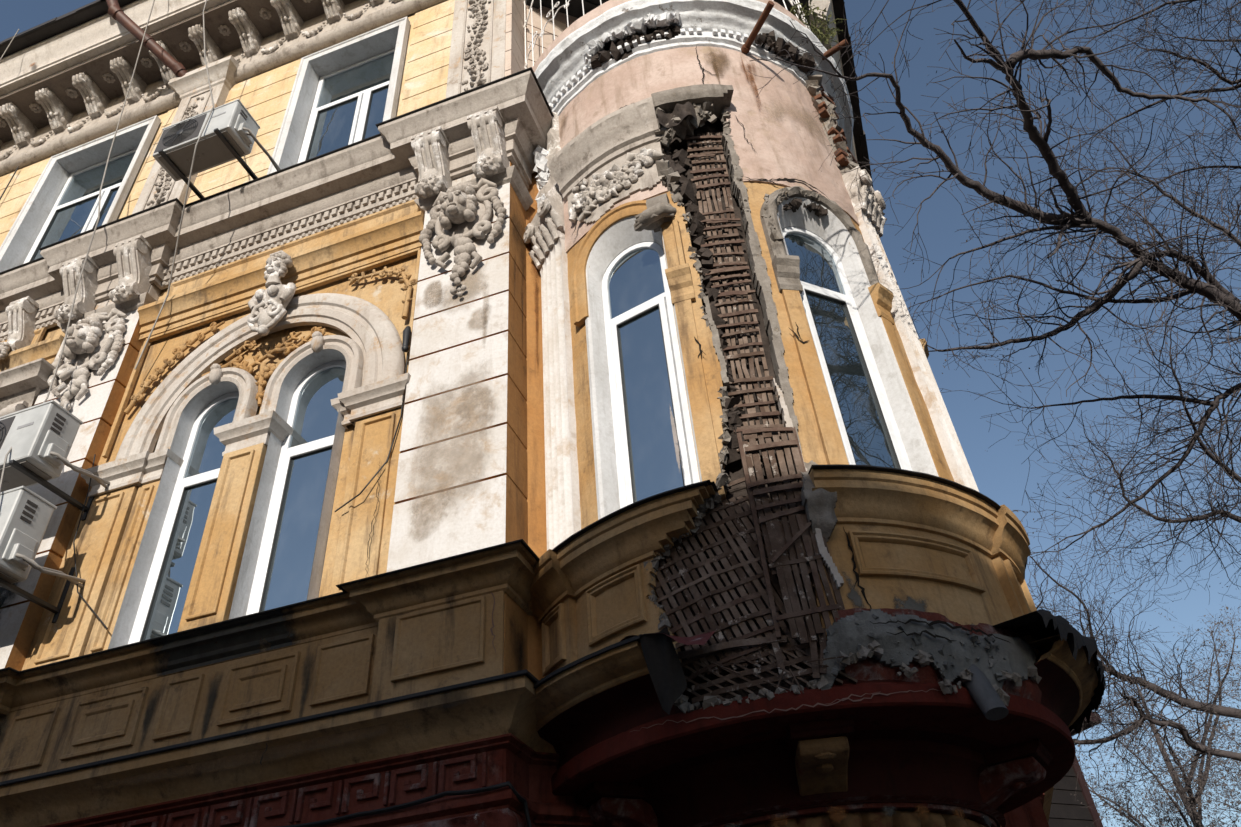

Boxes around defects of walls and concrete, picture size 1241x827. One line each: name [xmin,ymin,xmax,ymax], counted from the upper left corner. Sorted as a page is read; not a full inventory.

spalling [754,30,859,173]
spalling [621,101,883,715]
water stain [203,681,219,735]
water stain [150,609,298,676]
peeling [896,650,935,678]
peeling [938,668,973,695]
peeling [992,666,1042,706]